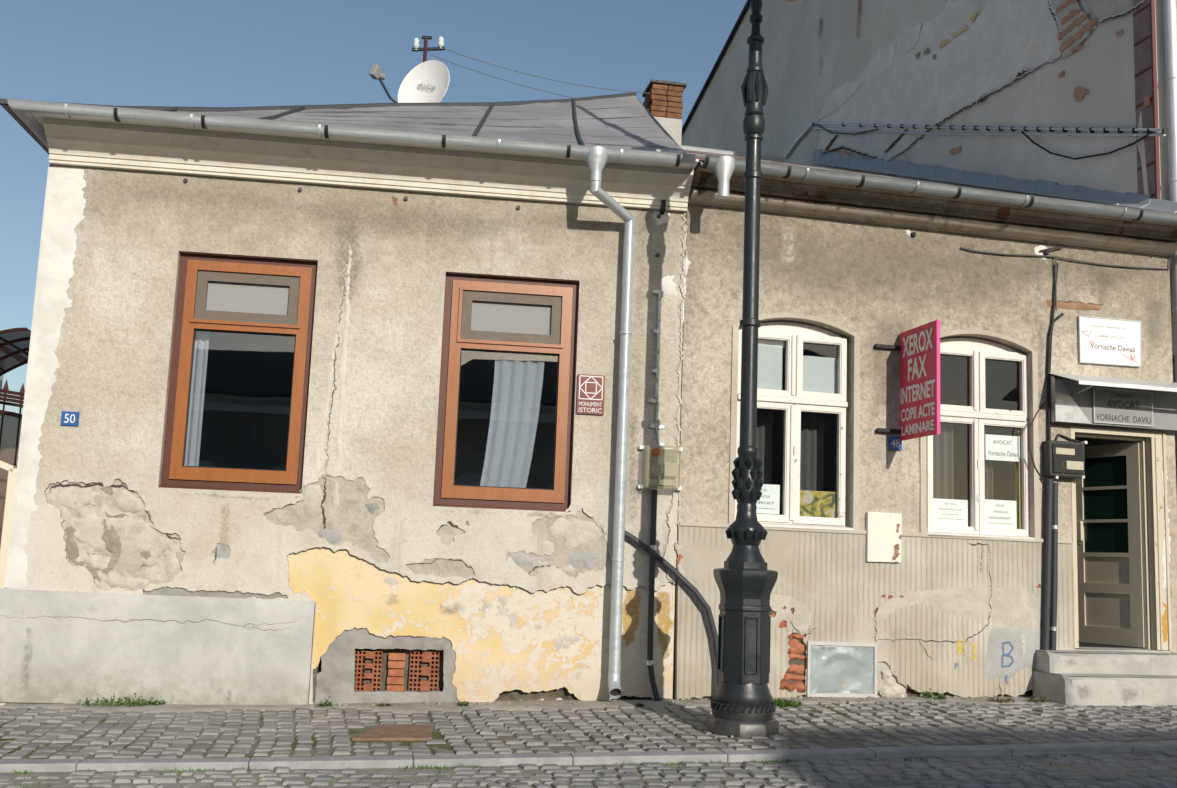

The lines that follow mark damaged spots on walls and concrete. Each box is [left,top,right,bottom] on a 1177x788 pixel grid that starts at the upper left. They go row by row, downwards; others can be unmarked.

flaking render [818,0,1133,160]
crack [311,243,353,479]
crack [661,213,691,584]
flaking render [45,479,186,591]
peeling [264,475,675,702]
flaking render [770,606,806,692]
crack [872,541,994,660]